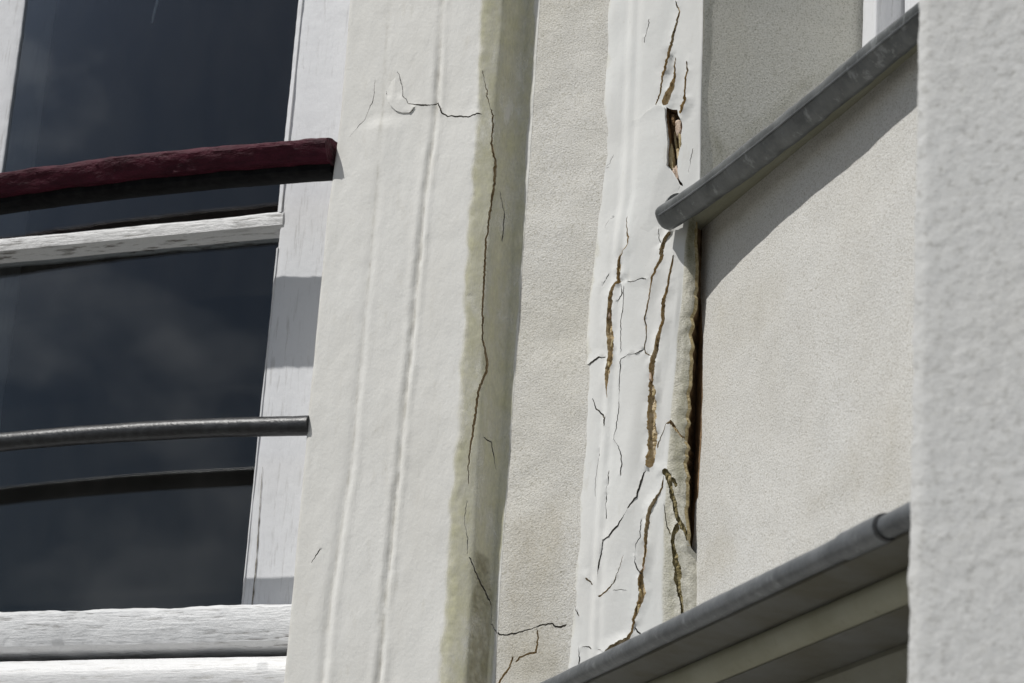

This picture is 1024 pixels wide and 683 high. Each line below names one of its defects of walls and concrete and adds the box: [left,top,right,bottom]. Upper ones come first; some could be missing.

crack [644,1,689,113]
spalling [666,107,683,186]
crack [357,71,703,683]